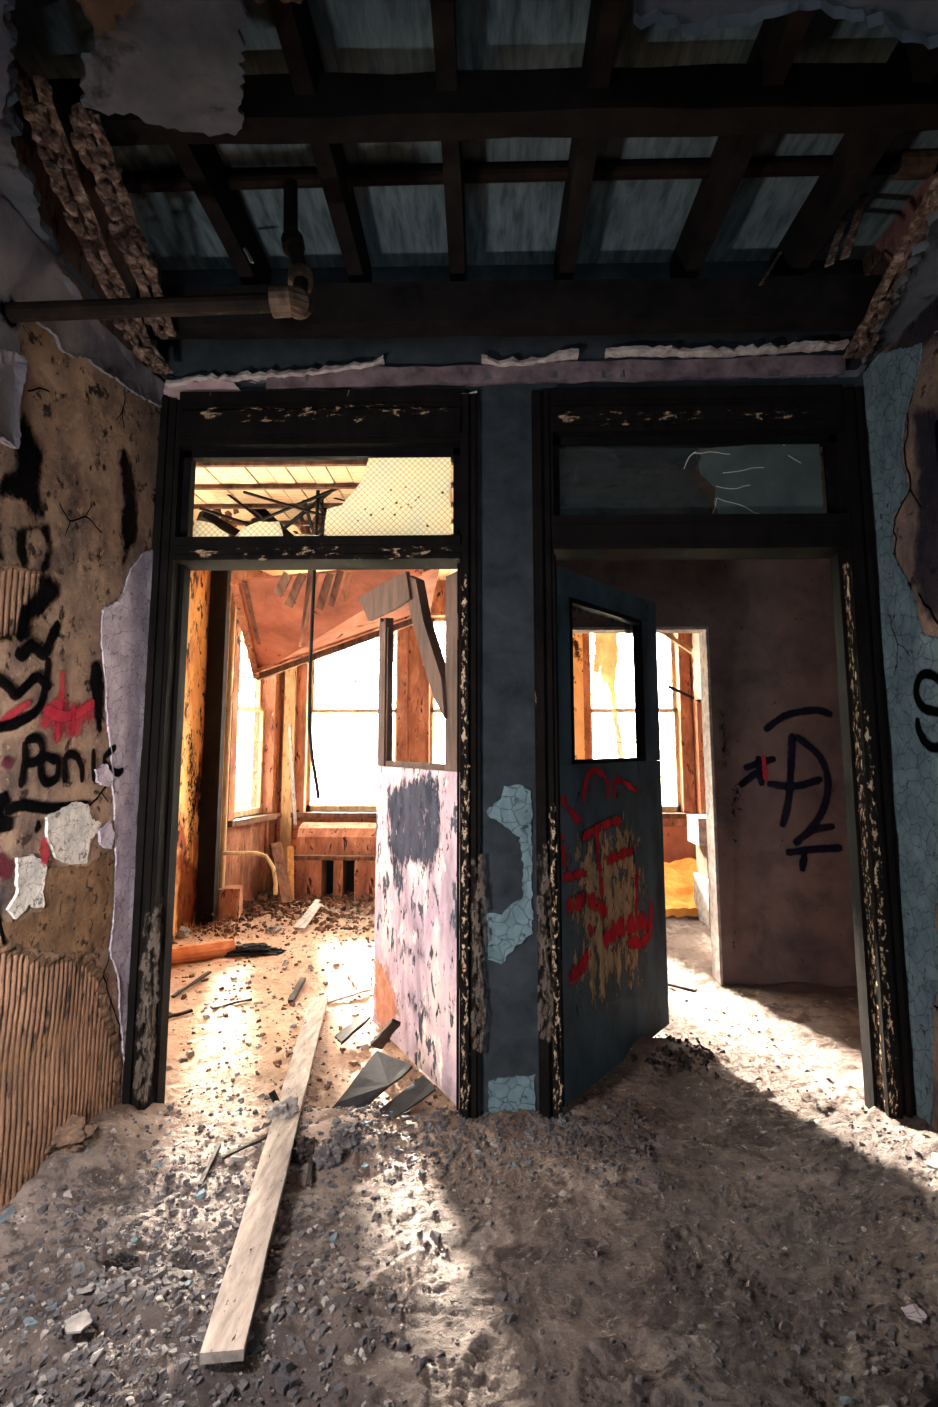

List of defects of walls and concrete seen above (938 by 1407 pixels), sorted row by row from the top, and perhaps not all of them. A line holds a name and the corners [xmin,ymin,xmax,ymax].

peeling [0,0,13,120]
flaking render [76,0,137,36]
spalling [0,550,165,1209]
peeling [842,331,938,1127]